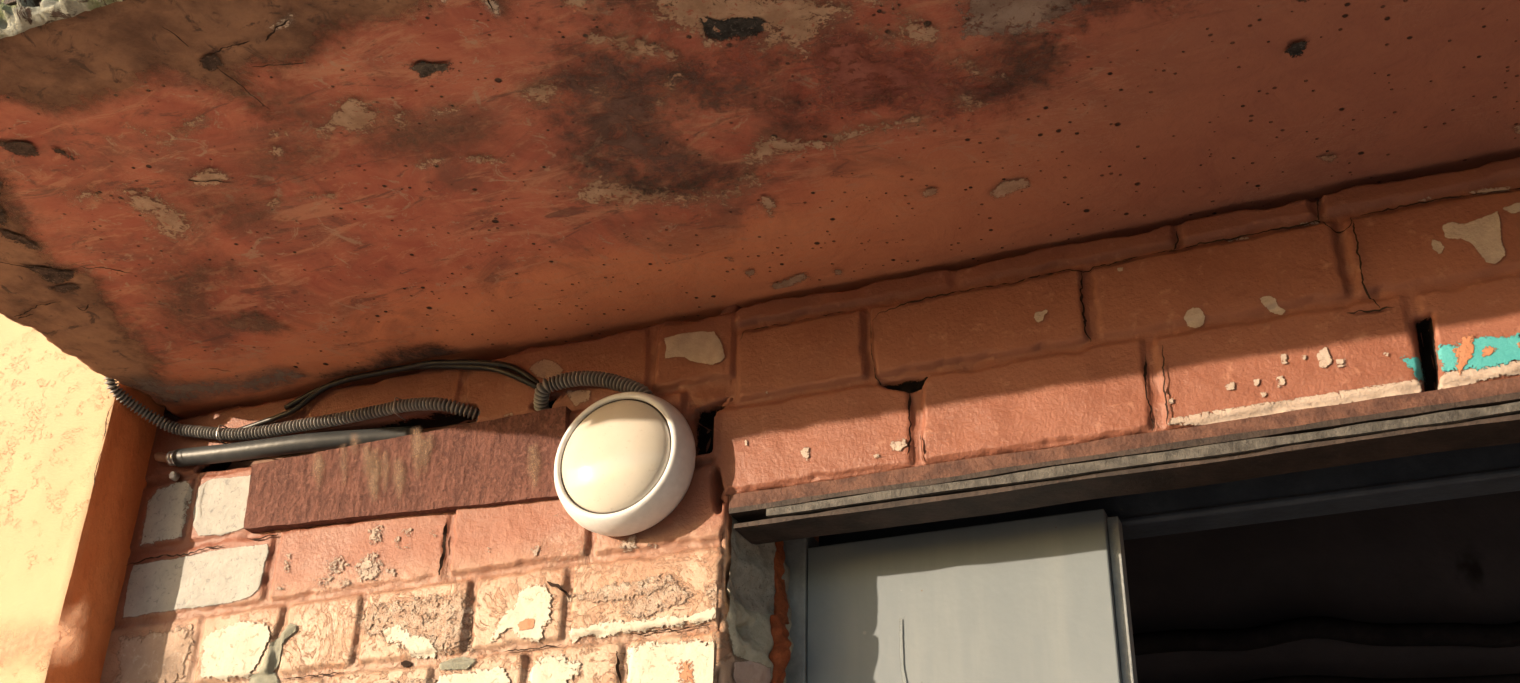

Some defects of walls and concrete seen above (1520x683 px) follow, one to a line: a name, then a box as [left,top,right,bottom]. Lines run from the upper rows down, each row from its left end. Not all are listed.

peeling [0,0,429,111]
peeling [582,0,941,107]
peeling [950,0,1101,112]
spalling [0,141,80,161]
damp [537,48,748,201]
peeling [1431,187,1520,264]
peeling [0,181,165,388]
peeling [664,331,725,365]
crack [740,188,1520,460]
peeling [1168,333,1520,426]
peeling [115,475,291,683]
peeling [350,515,794,683]